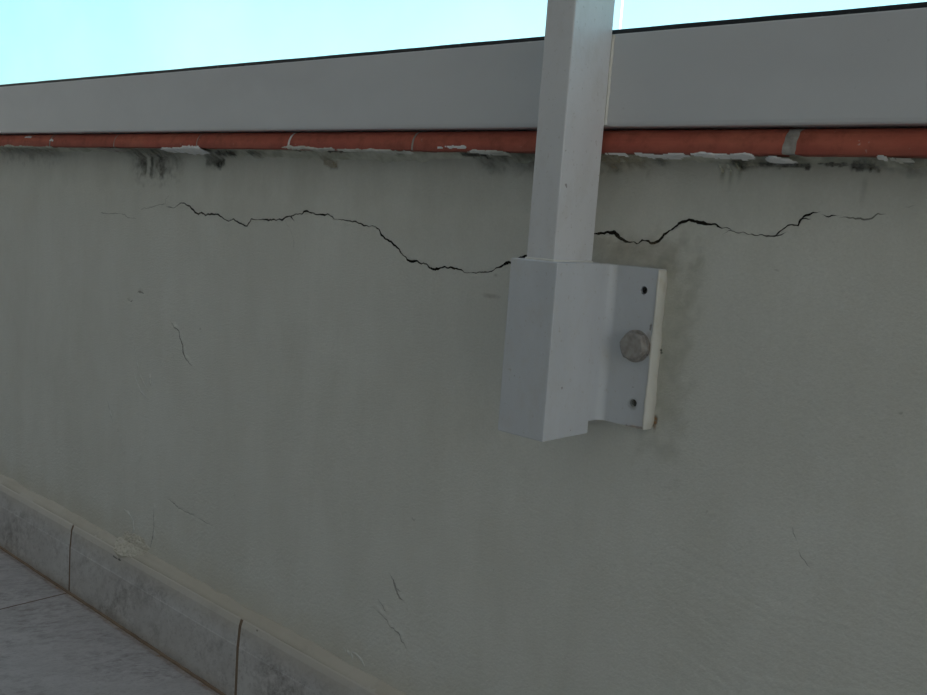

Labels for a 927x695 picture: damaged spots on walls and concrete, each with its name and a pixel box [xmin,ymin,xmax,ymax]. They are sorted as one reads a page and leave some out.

damp [731,159,879,171]
crack [101,198,527,273]
crack [594,212,882,244]